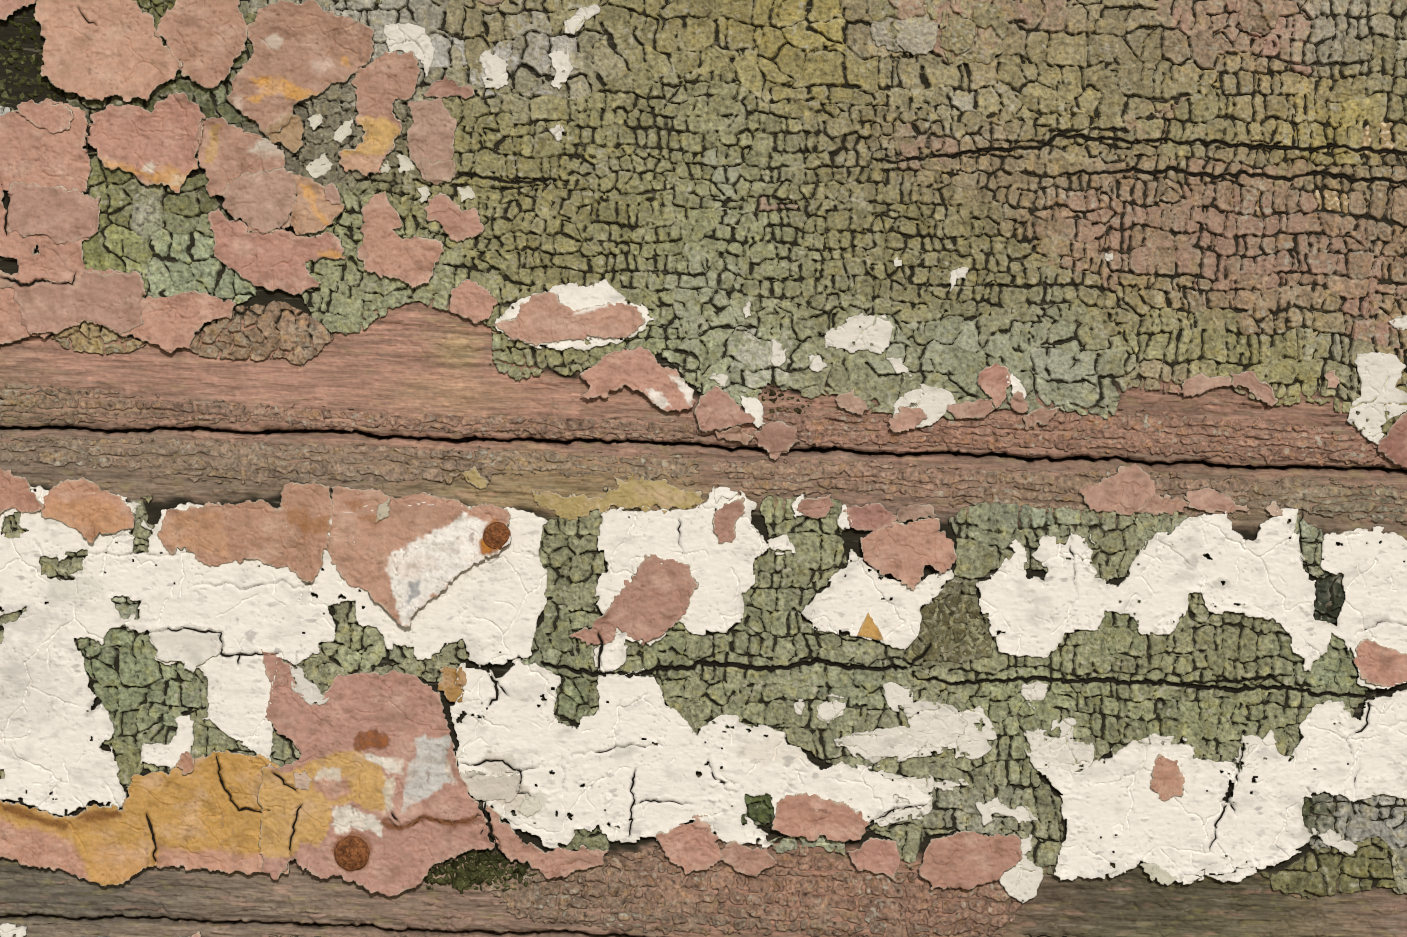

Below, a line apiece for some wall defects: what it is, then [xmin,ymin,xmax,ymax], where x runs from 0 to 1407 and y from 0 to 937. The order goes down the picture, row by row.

peeling [549,4,600,90]
peeling [0,0,509,354]
crack [872,134,1407,184]
peeling [1347,352,1407,468]
rust [480,521,498,554]
peeling [0,466,997,897]
crack [542,633,1402,797]
peeling [918,463,1407,904]
crack [146,814,158,869]
crack [213,748,303,854]
crack [1209,748,1243,850]
peeling [0,923,28,937]